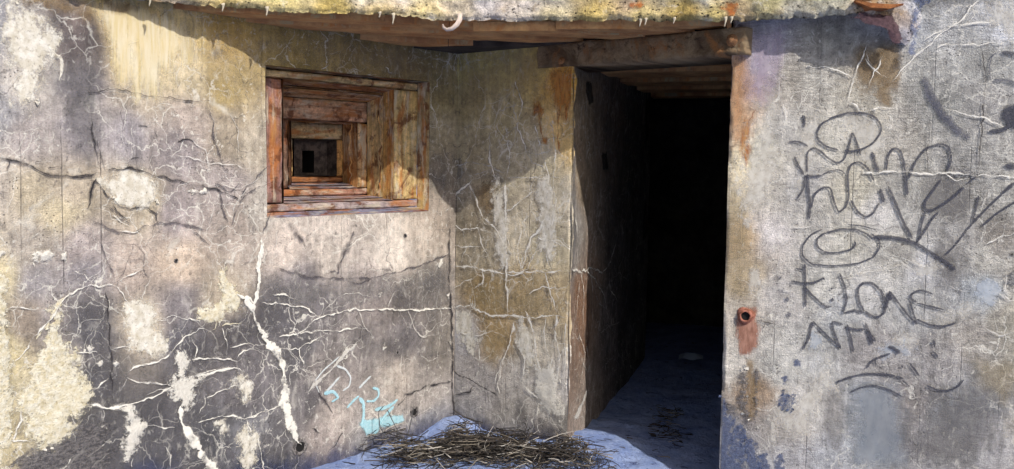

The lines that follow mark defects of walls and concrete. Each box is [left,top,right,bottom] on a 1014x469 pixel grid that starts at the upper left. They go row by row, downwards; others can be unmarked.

peeling [0,272,118,469]
peeling [123,300,169,358]
crack [5,82,616,469]
rust [736,308,758,419]